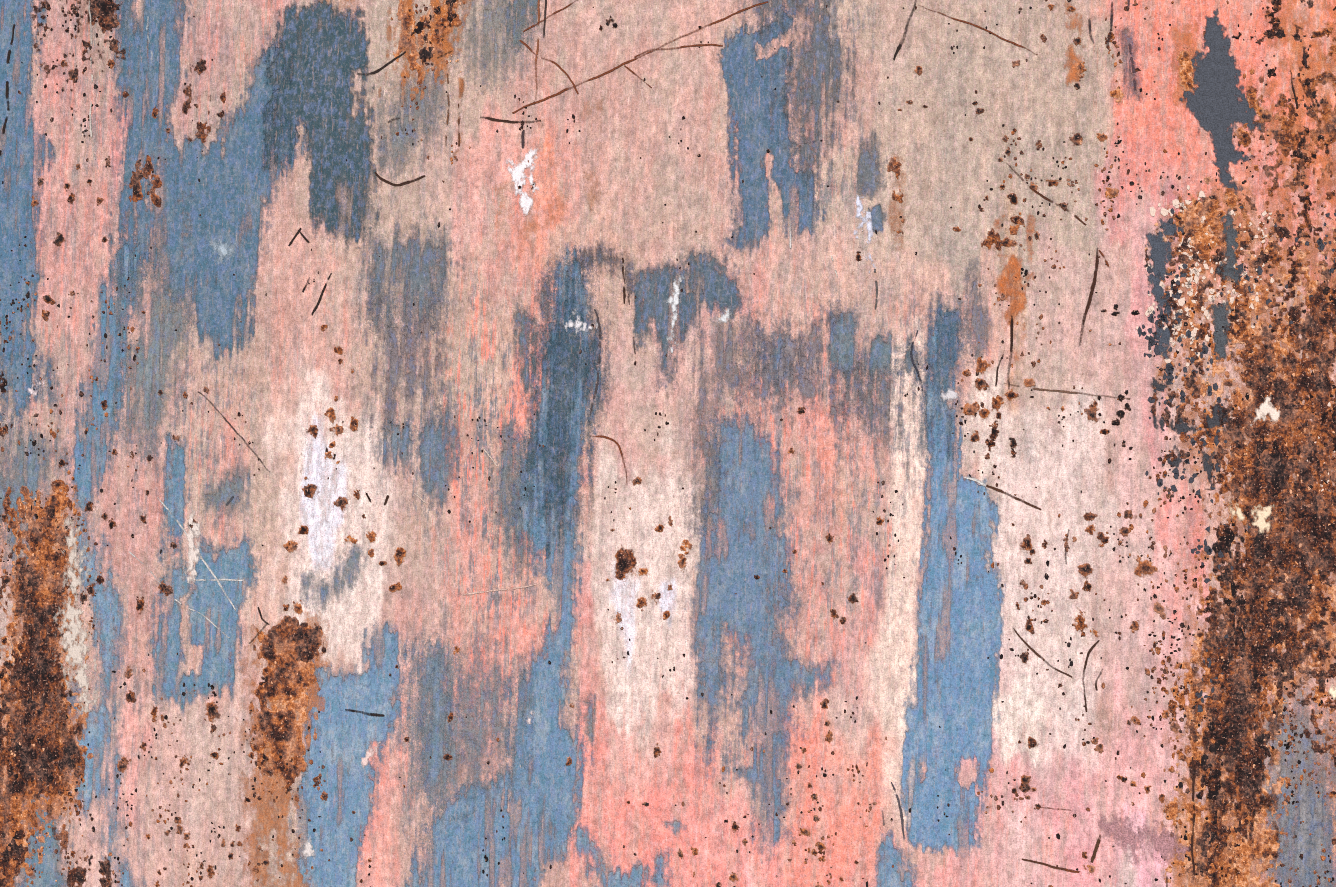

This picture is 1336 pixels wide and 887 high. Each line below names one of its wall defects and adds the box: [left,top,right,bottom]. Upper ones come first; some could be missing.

rust [32,0,126,91]
rust [387,0,467,141]
rust [978,128,1120,325]
rust [0,274,75,344]
rust [1016,0,1336,887]
rust [0,394,124,887]
rust [125,666,145,703]
rust [117,742,157,773]
rust [158,580,173,596]
rust [146,697,218,887]
rust [206,600,328,887]
rust [977,775,1041,823]